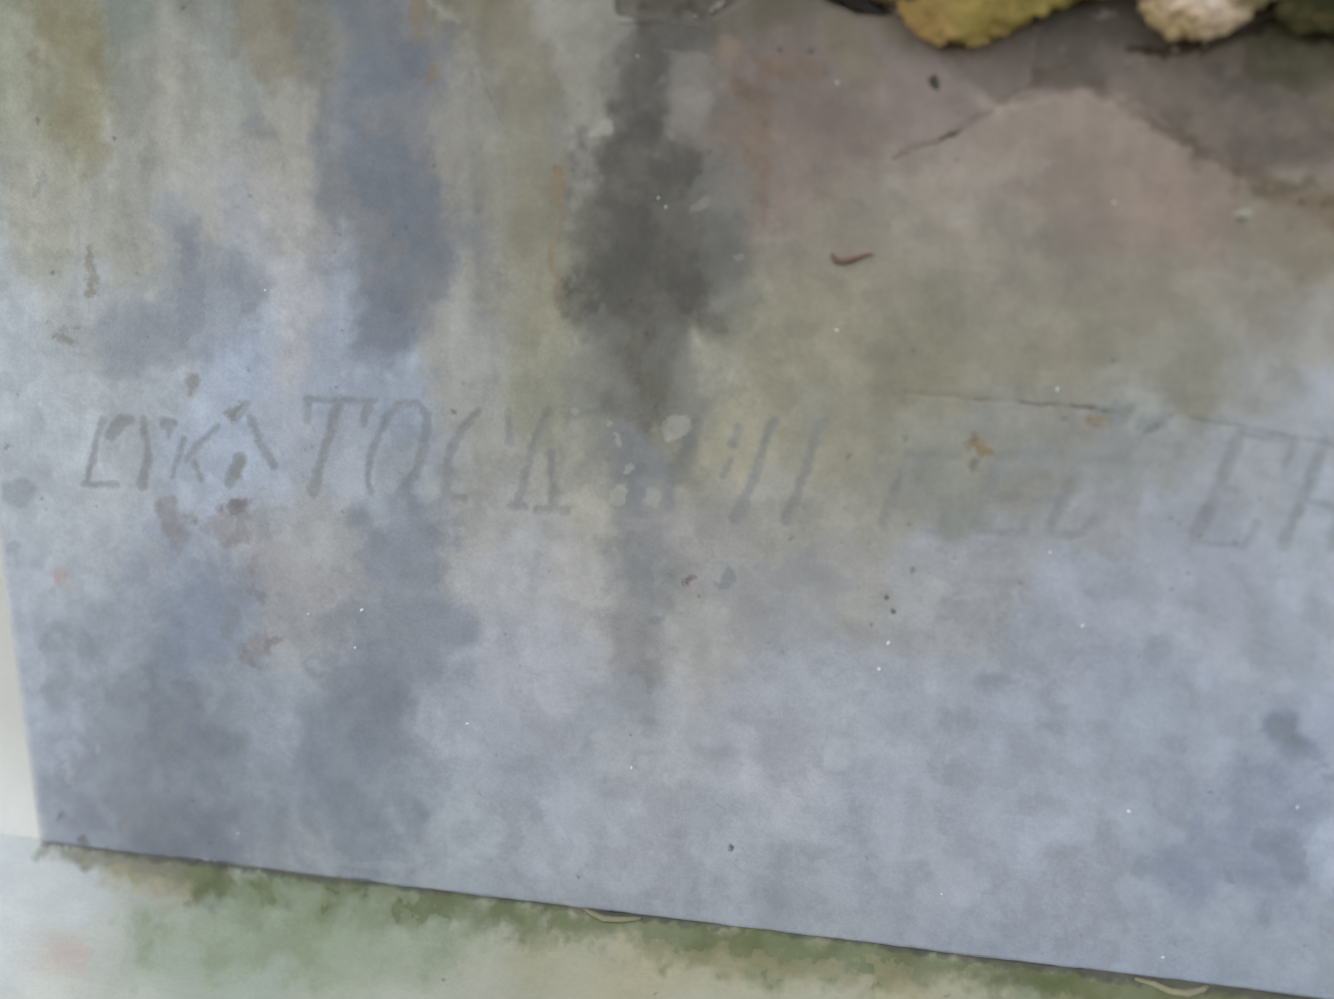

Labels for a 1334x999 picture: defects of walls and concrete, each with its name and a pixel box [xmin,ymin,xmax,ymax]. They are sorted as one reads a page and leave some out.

water stain [38,5,120,183]
crack [891,110,995,161]
water stain [52,185,280,388]
water stain [320,0,861,789]
crack [903,391,1115,415]
water stain [0,474,40,511]